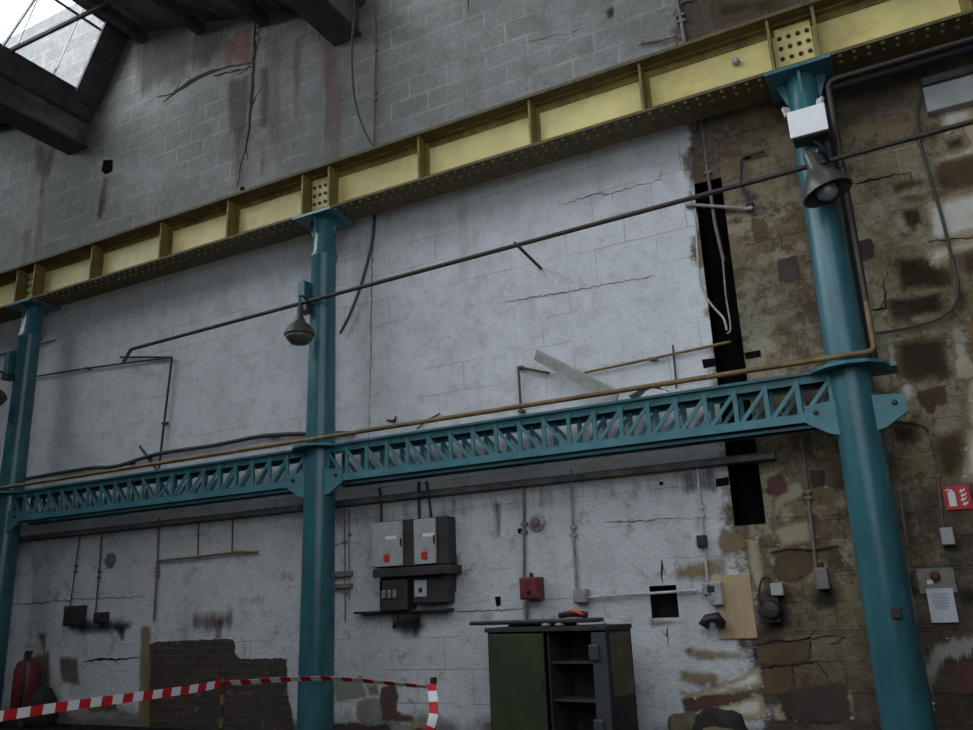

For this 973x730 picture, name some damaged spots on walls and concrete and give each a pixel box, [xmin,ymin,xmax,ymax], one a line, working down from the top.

crack [156,22,261,188]
crack [563,170,662,205]
crack [853,172,912,187]
peeling [924,191,973,268]
crack [506,275,655,302]
crack [871,270,888,311]
leakage [891,421,920,443]
leakage [897,337,950,413]
peeling [950,327,973,483]
flaking render [64,626,293,730]
peeling [334,685,440,730]
flaking render [681,640,810,720]